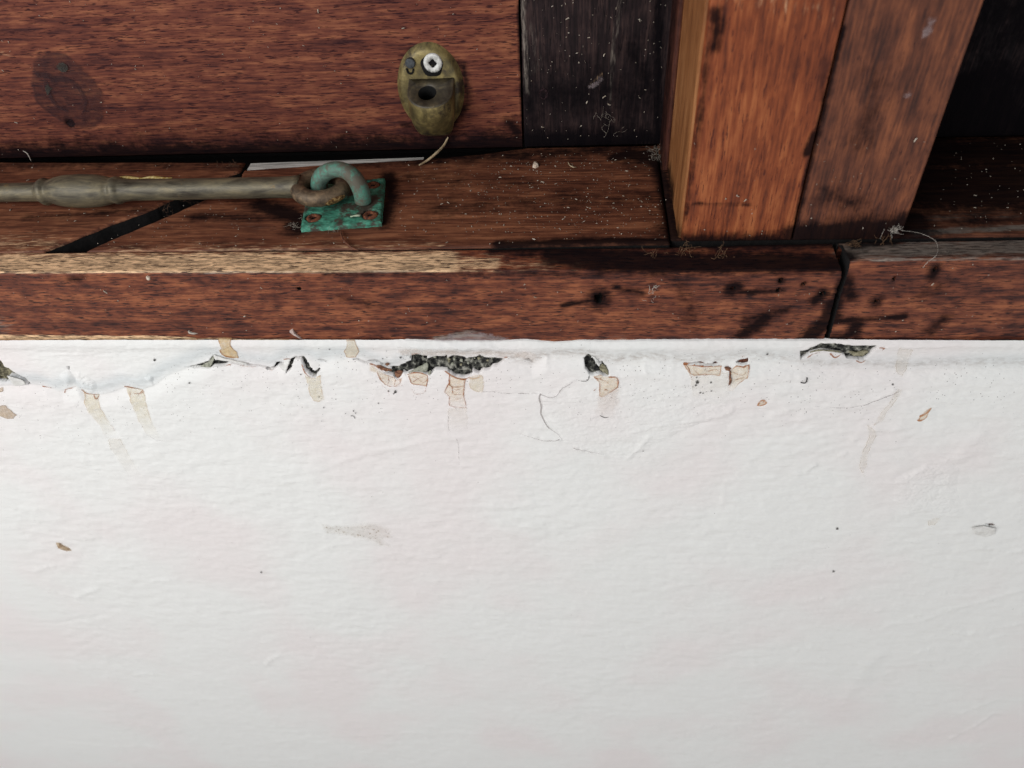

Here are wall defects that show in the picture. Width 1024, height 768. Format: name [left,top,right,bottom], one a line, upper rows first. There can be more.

spalling [0,361,26,392]
spalling [197,354,247,367]
spalling [275,356,320,377]
spalling [371,353,507,380]
spalling [584,354,609,375]
spalling [683,358,748,386]
spalling [800,343,885,363]